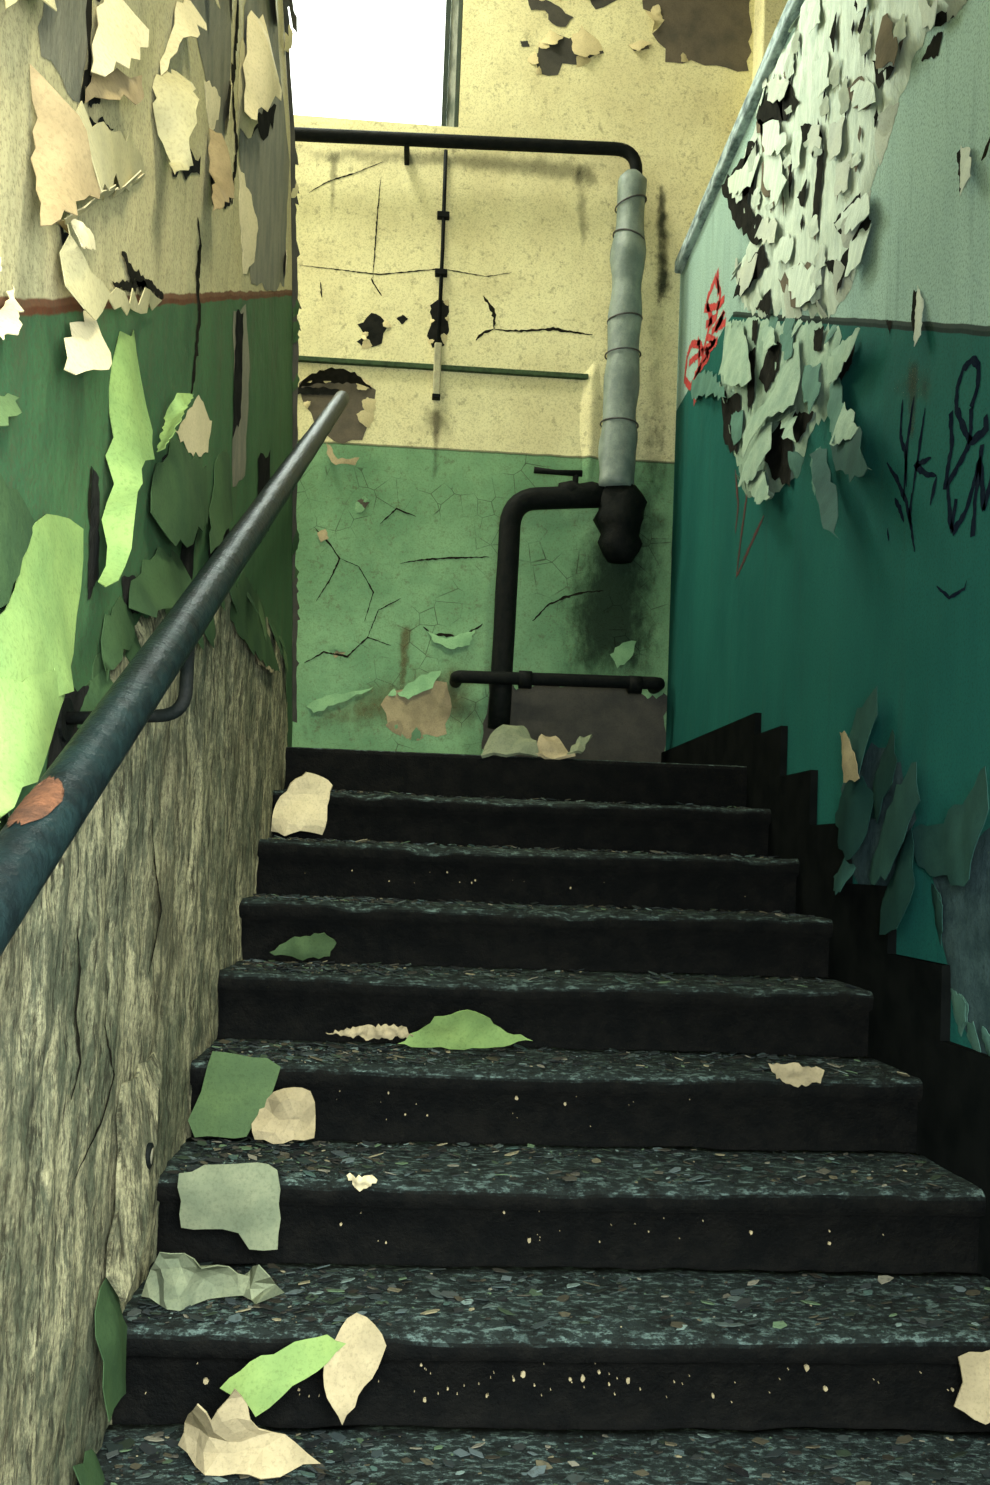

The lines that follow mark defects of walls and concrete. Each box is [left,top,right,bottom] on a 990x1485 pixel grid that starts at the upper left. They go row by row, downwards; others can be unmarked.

peeling [520,0,604,76]
peeling [587,0,616,9]
peeling [628,0,752,72]
crack [302,162,593,340]
peeling [691,0,967,540]
spalling [357,313,408,349]
spalling [427,300,449,348]
peeling [0,0,376,831]
crack [380,508,415,524]
crack [305,527,487,663]
corrosion [6,776,64,827]
peeling [0,484,990,1485]